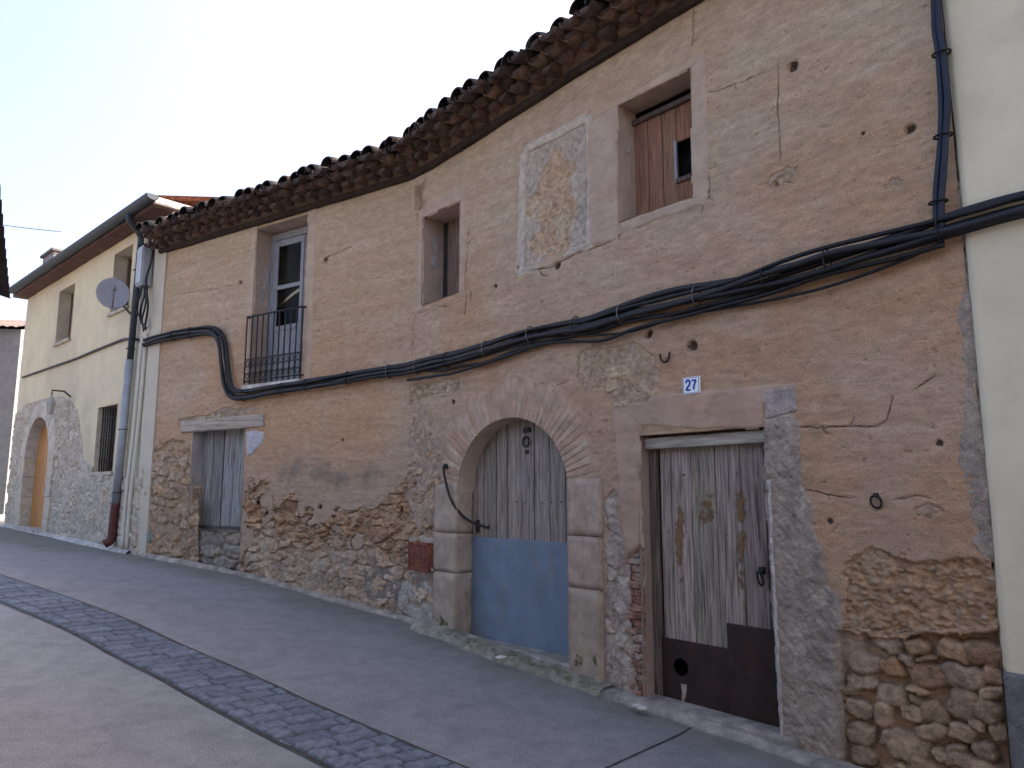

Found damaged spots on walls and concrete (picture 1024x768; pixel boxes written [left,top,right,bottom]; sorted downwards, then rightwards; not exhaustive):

crack [710,64,791,185]
peeling [515,113,593,276]
crack [800,375,935,434]
flaking render [623,547,647,711]
flaking render [843,548,1000,639]